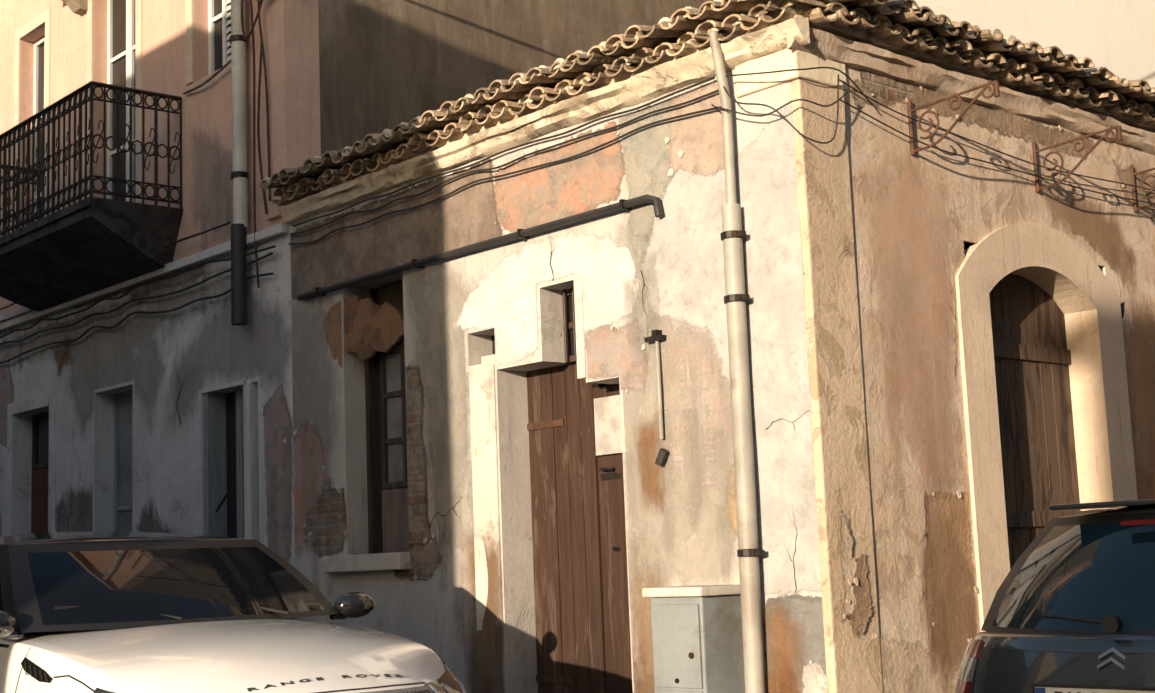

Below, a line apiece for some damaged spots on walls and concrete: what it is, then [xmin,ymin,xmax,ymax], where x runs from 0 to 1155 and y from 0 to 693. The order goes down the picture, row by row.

peeling [276,80,725,301]
peeling [323,295,404,367]
peeling [0,356,14,447]
leakage [55,488,92,532]
leakage [139,503,170,533]
peeling [173,294,348,560]
spalling [394,356,442,582]
crack [784,512,797,592]